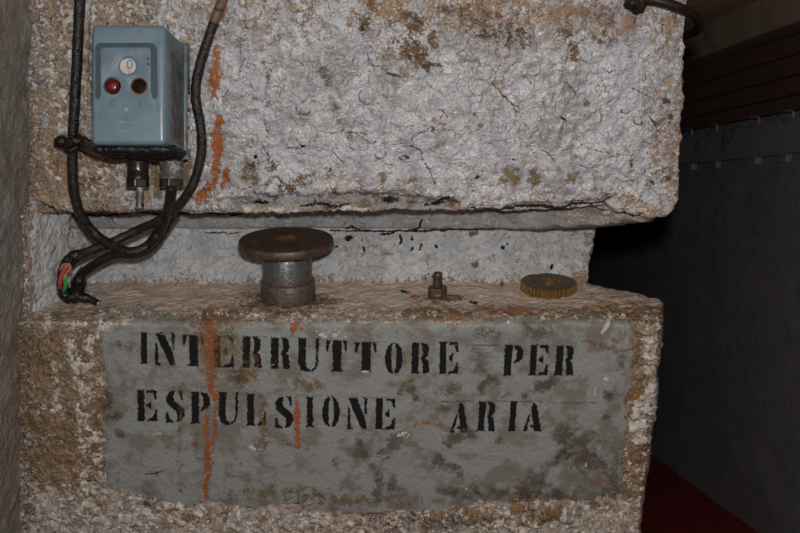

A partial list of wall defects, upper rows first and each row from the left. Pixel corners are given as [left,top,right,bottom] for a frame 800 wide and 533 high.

corrosion [208,45,223,100]
corrosion [192,114,231,202]
crack [40,201,242,234]
crack [329,196,641,236]
corrosion [185,276,342,500]
damp [522,378,556,397]
damp [227,431,411,507]
damp [488,423,620,503]